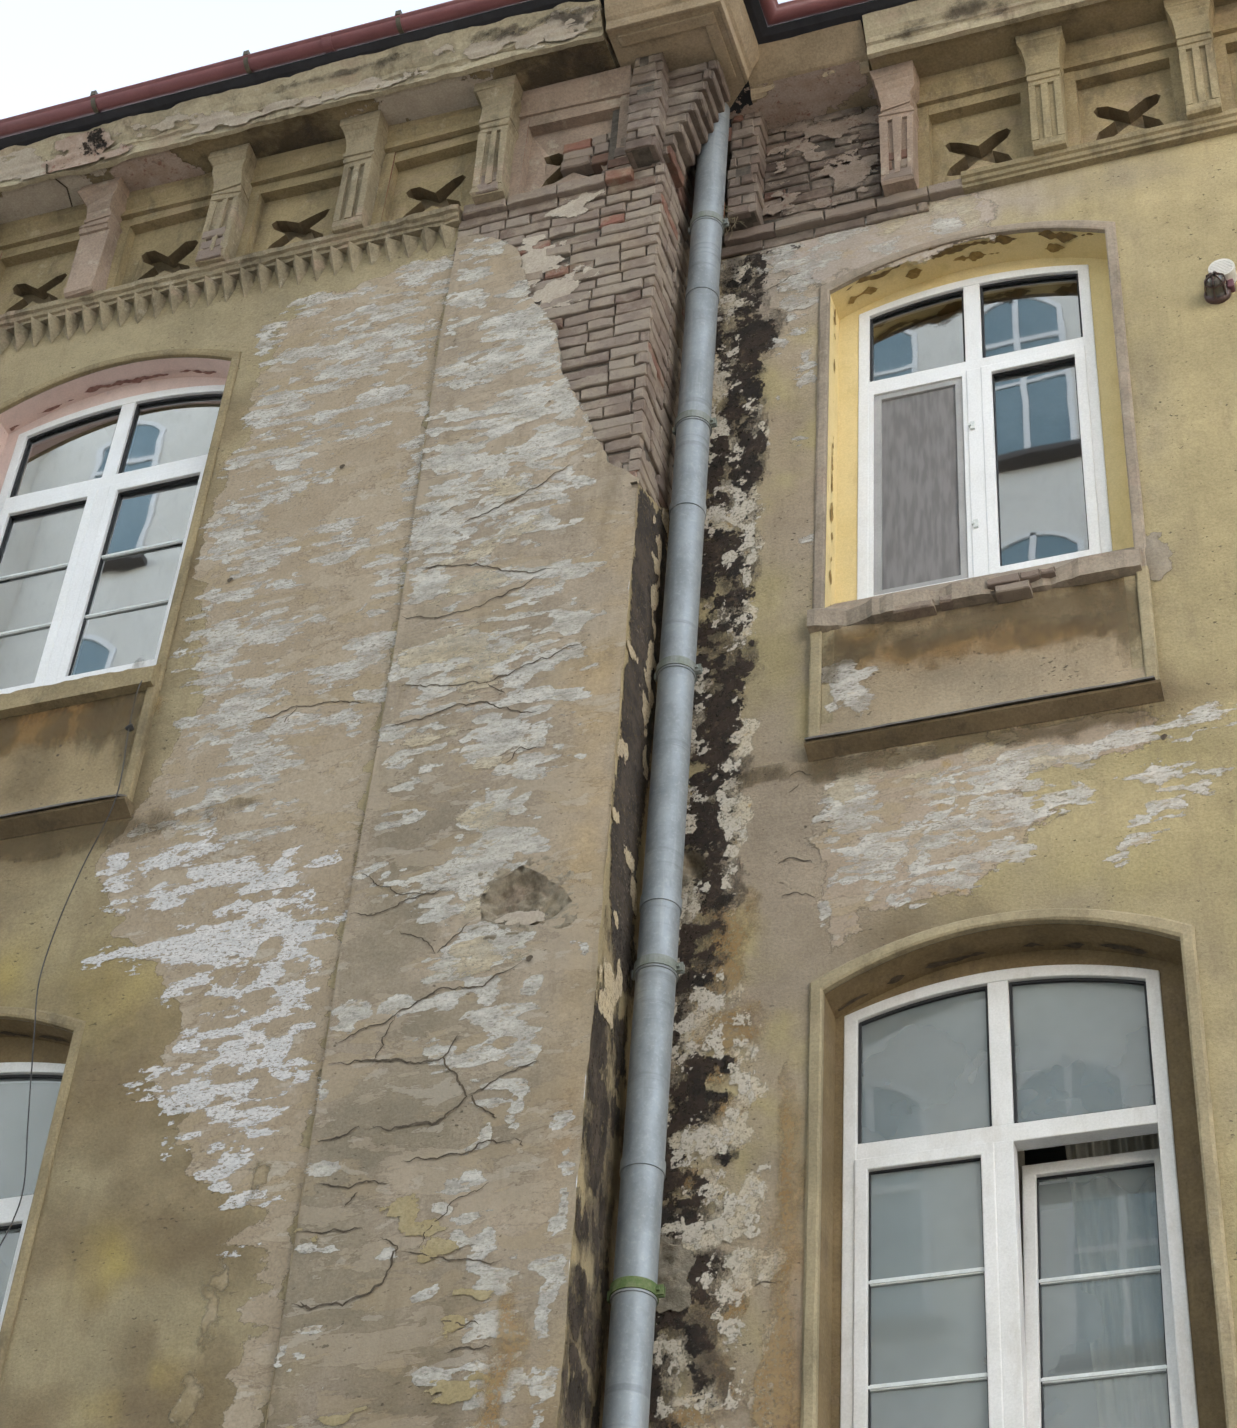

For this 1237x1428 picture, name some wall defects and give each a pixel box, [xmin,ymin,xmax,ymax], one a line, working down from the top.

flaking render [1038,230,1095,253]
crack [404,563,550,619]
crack [349,873,470,953]
crack [260,639,587,763]
peeling [95,52,1017,1428]
water stain [559,488,670,1428]
water stain [661,244,801,1245]
water stain [808,707,1147,781]
peeling [805,701,1237,953]
crack [292,960,536,1310]
water stain [649,1246,734,1428]